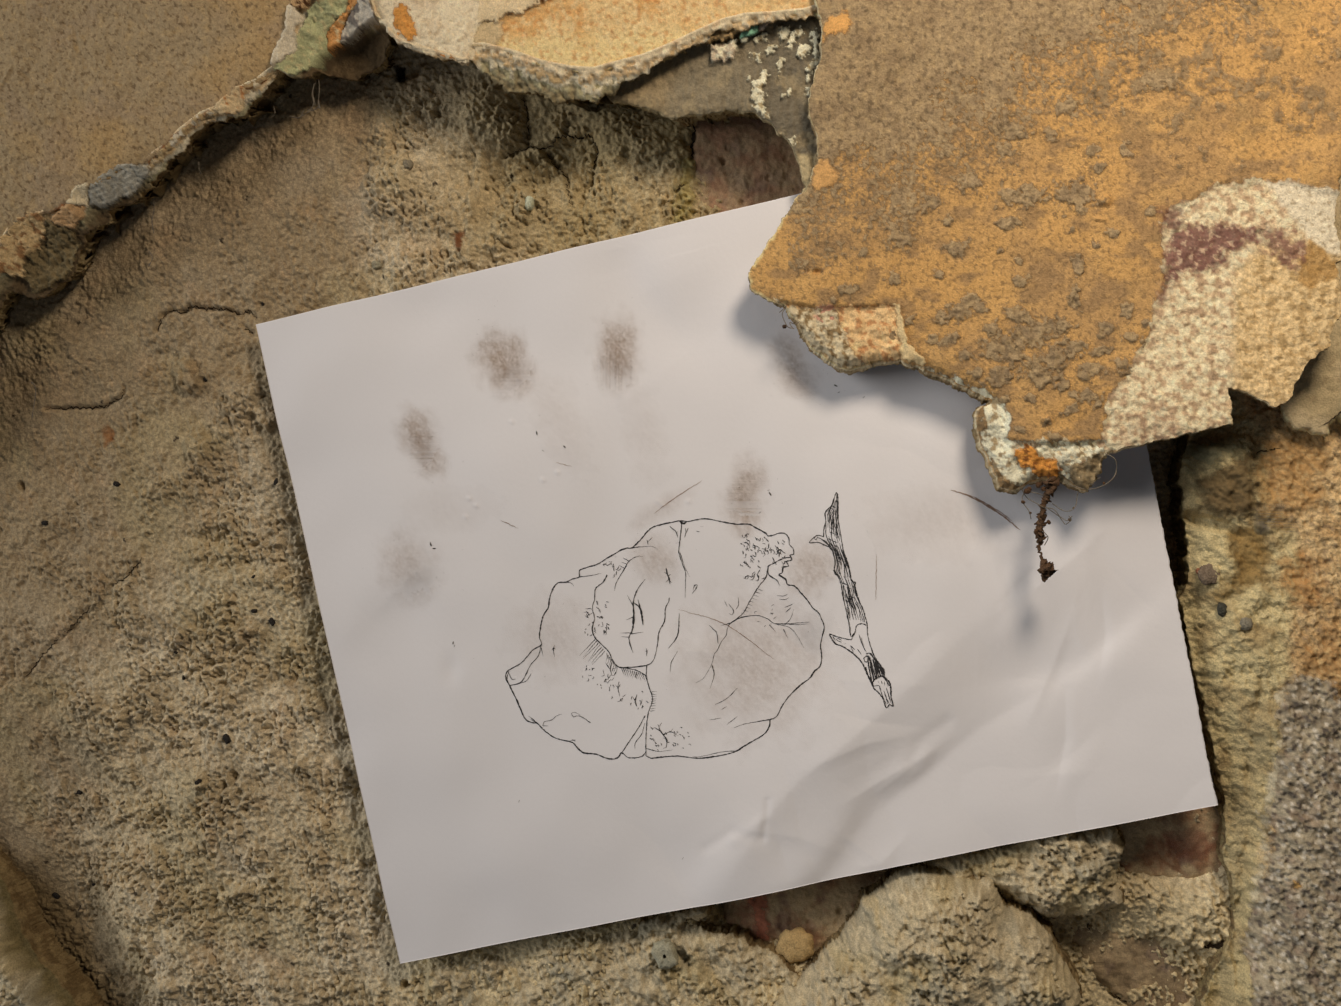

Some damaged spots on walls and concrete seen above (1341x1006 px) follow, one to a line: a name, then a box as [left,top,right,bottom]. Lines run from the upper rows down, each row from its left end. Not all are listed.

peeling [270,0,379,75]
peeling [472,0,547,47]
peeling [0,86,245,293]
peeling [706,0,1341,490]
spalling [1240,675,1341,1006]